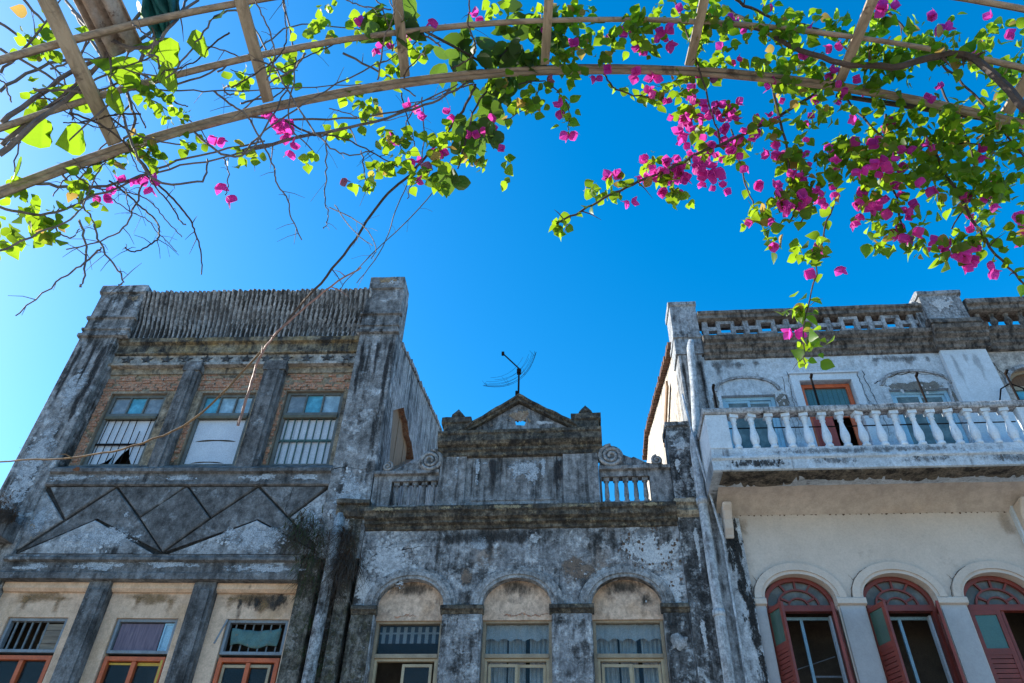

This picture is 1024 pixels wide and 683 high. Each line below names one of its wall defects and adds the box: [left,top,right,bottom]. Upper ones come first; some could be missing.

damp [49,344,107,421]
damp [353,341,391,438]
damp [731,445,954,468]
damp [424,529,559,552]
damp [228,594,287,617]
damp [397,582,426,596]
damp [504,582,536,593]
damp [607,581,650,604]
damp [723,518,769,683]